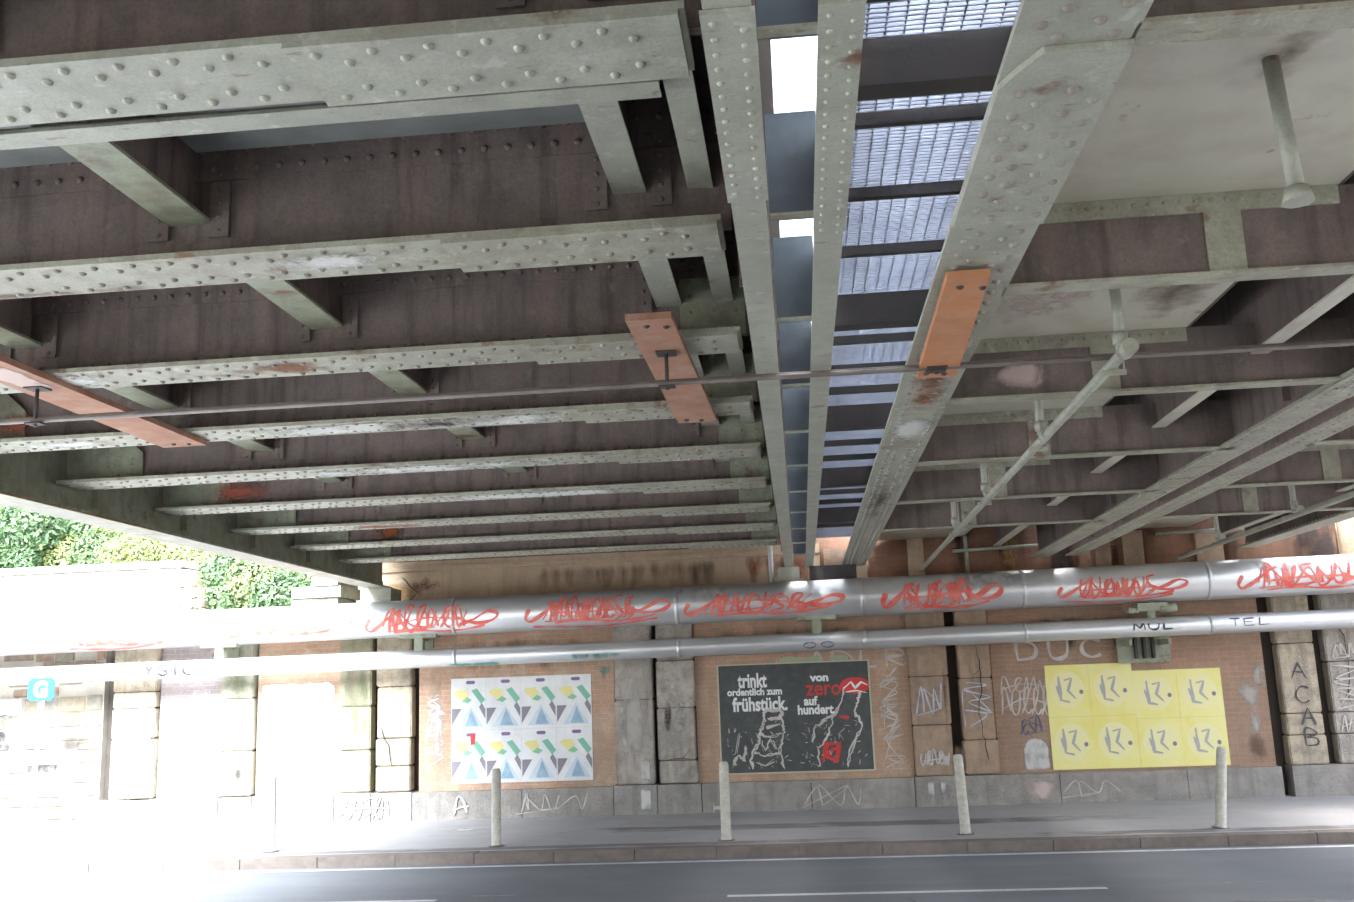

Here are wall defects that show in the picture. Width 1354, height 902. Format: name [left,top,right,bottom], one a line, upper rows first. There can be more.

peeling [279,255,366,268]